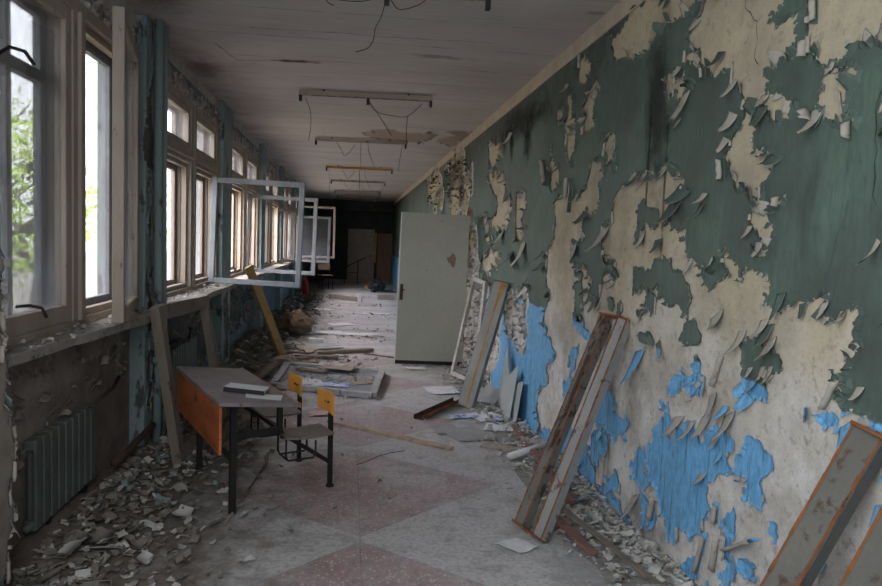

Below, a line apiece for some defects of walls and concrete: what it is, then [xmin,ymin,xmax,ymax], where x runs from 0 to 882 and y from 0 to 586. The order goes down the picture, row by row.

peeling [0,247,135,586]
peeling [358,128,528,367]
peeling [483,0,882,586]